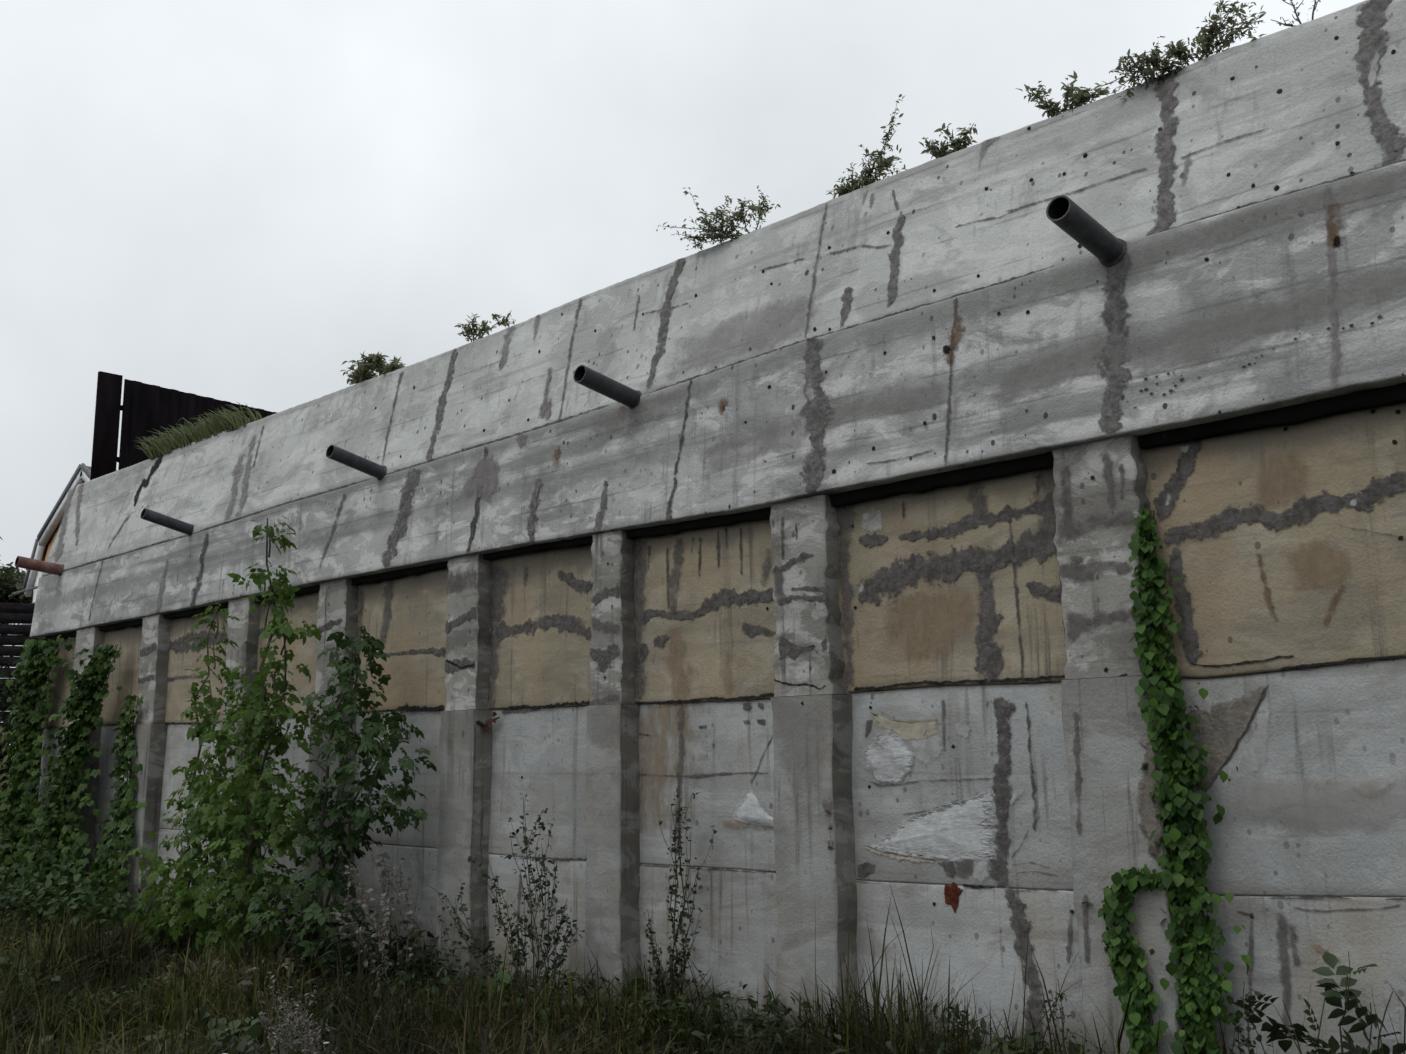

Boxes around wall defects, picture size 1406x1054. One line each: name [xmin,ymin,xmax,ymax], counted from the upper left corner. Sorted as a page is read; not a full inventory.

peeling [865,713,970,764]
peeling [858,790,1022,881]
rust [944,882,963,913]